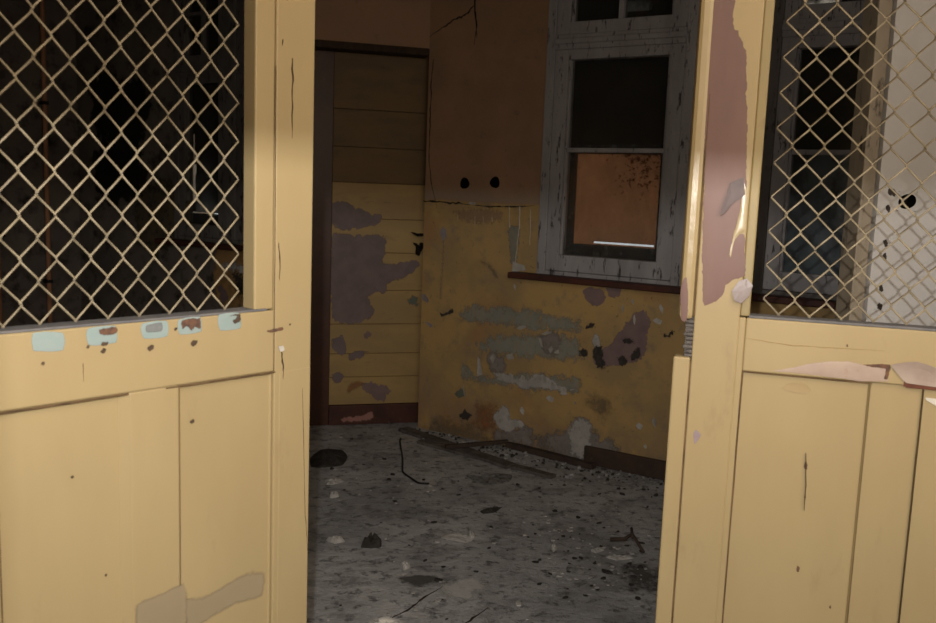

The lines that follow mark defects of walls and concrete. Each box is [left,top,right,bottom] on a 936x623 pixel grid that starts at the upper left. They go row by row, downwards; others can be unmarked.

crack [432,0,477,43]
peeling [702,0,753,306]
peeling [331,201,420,324]
peeling [440,287,663,404]
peeling [774,361,936,387]
peeling [341,411,374,422]
flaking render [493,405,620,460]